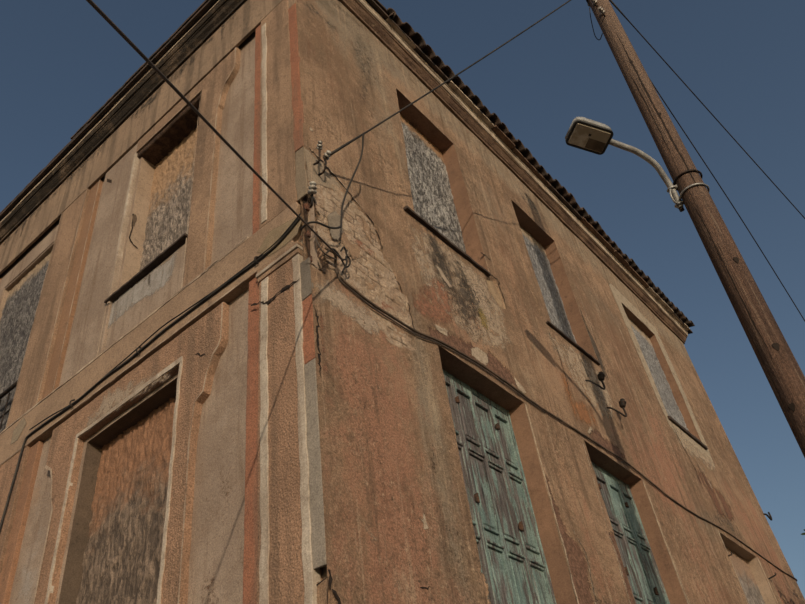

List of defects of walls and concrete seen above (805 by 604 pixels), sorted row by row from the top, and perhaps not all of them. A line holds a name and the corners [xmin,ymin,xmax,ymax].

crack [129,214,137,248]
crack [313,305,327,376]
flaking render [299,149,526,393]
damp [414,230,510,349]